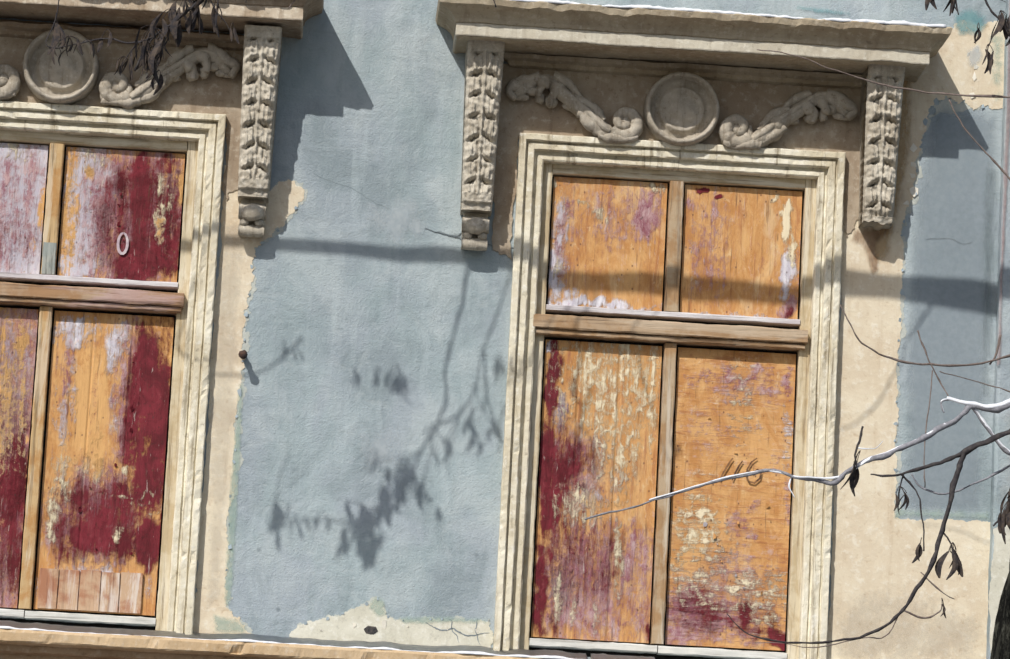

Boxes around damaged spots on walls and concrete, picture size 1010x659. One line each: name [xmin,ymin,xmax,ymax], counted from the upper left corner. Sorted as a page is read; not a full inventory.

peeling [193,179,308,634]
peeling [289,596,494,648]
crack [426,618,484,644]
peeling [827,20,1010,659]